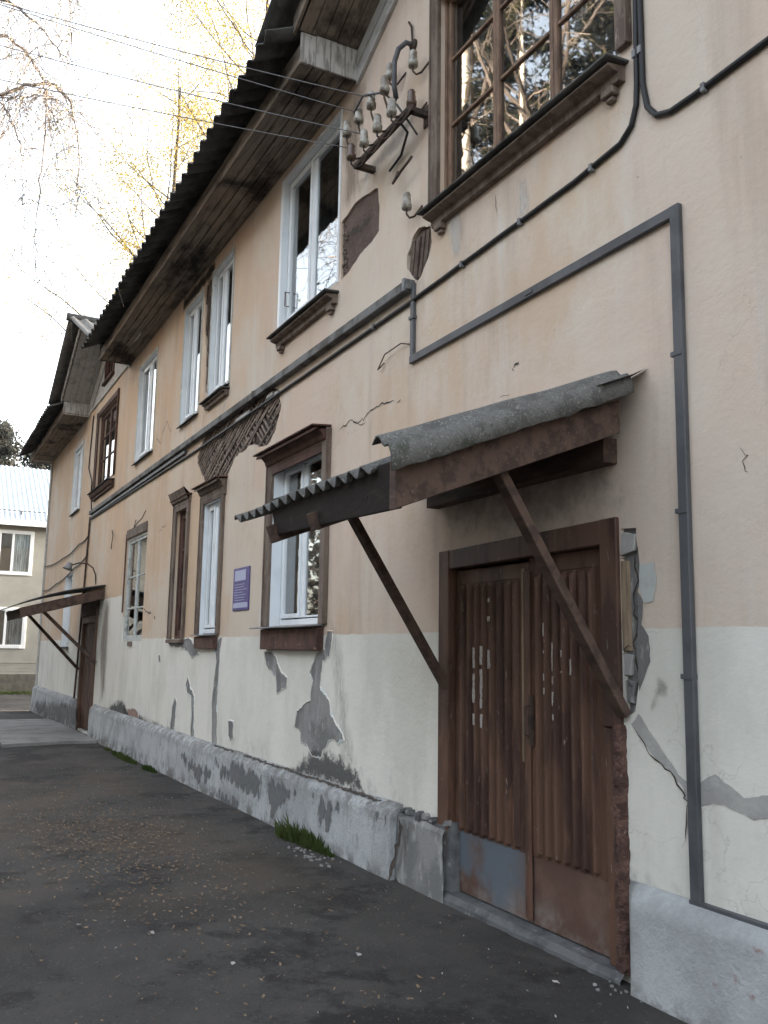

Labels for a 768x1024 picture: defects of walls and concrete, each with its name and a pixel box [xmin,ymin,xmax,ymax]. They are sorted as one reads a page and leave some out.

crack [340,399,401,429]
peeling [158,636,199,663]
peeling [170,676,195,737]
peeling [179,636,296,819]
peeling [294,630,345,760]
flaking render [620,528,650,714]